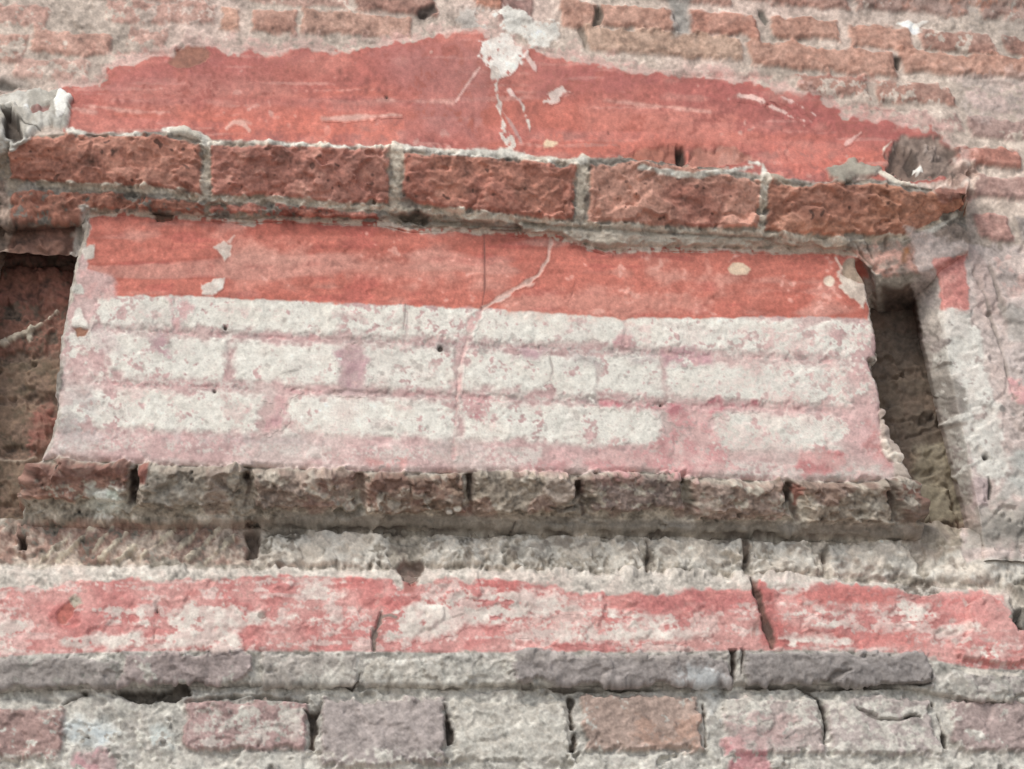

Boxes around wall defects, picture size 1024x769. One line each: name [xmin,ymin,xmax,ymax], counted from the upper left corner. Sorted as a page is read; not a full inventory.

peeling [453,3,559,151]
spalling [0,78,74,158]
spalling [622,143,760,169]
spalling [878,132,964,189]
crack [447,234,554,463]
crack [539,355,559,395]
peeling [789,256,912,507]
peeling [55,577,351,657]
peeling [382,577,717,648]
crack [748,575,778,651]
peeling [758,570,864,649]
peeling [888,576,1012,664]